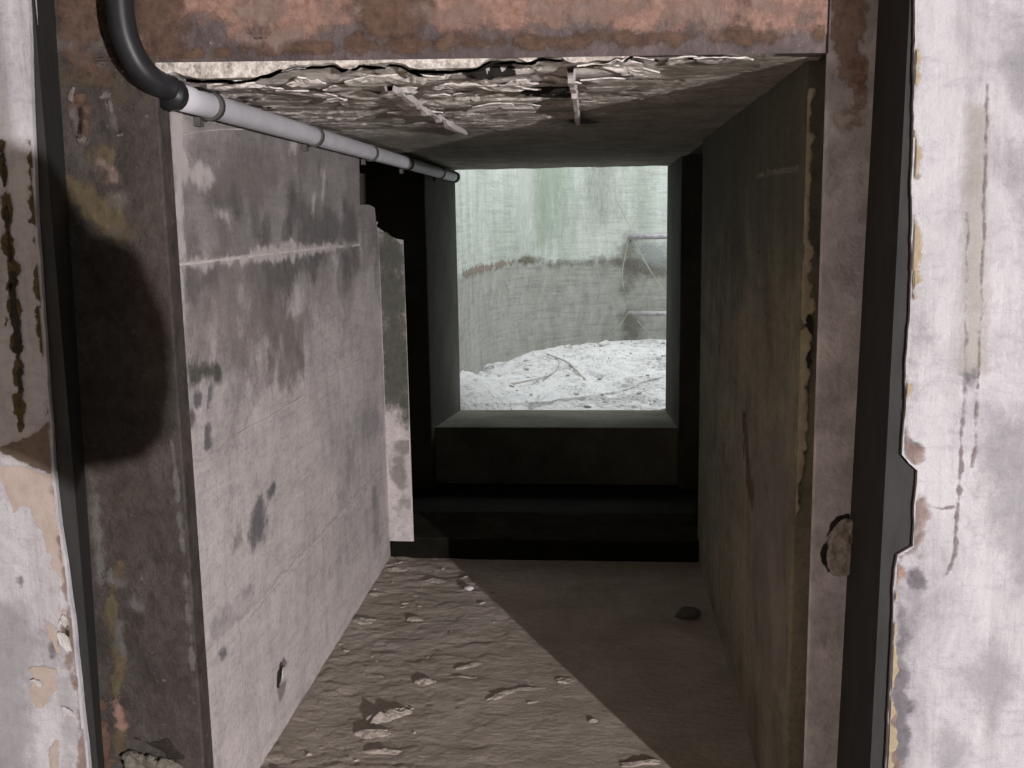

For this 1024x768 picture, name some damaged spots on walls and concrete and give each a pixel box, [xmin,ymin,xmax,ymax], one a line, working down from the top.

peeling [185,56,753,116]
corrosion [134,0,869,130]
leakage [170,111,357,381]
flaking render [913,215,923,300]
flaking render [906,428,925,465]
peeling [0,465,68,591]
spalling [820,514,853,577]
peeling [45,610,72,654]
peeling [29,666,59,708]
flaking render [888,623,900,768]
peeling [48,741,59,768]